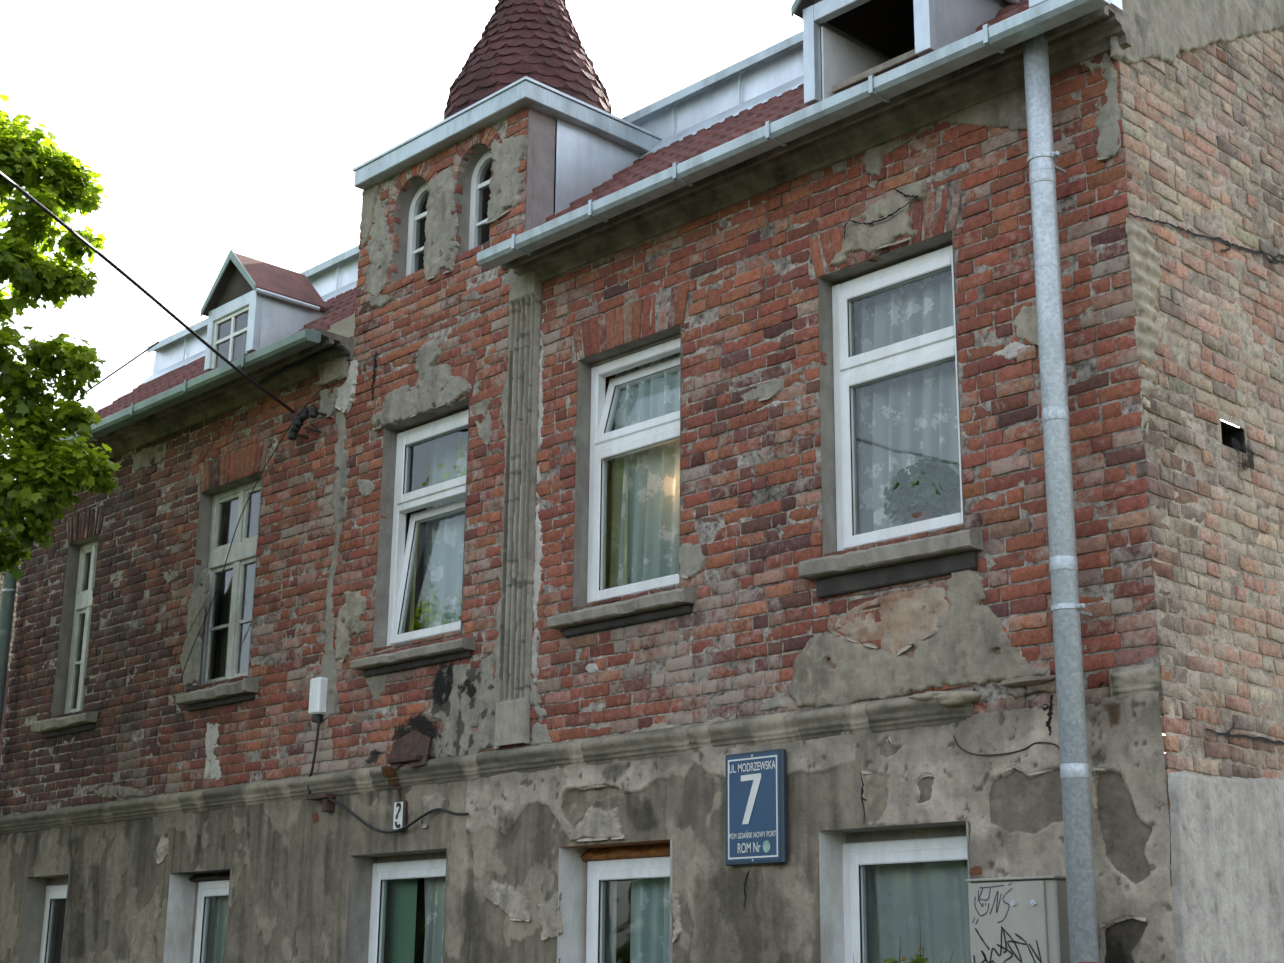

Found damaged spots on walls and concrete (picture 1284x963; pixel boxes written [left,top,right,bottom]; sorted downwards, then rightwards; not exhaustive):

peeling [1080,0,1284,162]
peeling [361,183,394,308]
peeling [423,165,460,281]
peeling [485,135,529,224]
peeling [830,85,1027,267]
crack [1129,213,1284,263]
peeling [371,303,511,496]
peeling [318,357,376,721]
water stain [365,749,381,764]
water stain [392,661,476,741]
peeling [759,570,1057,714]
flaking render [1091,767,1152,884]